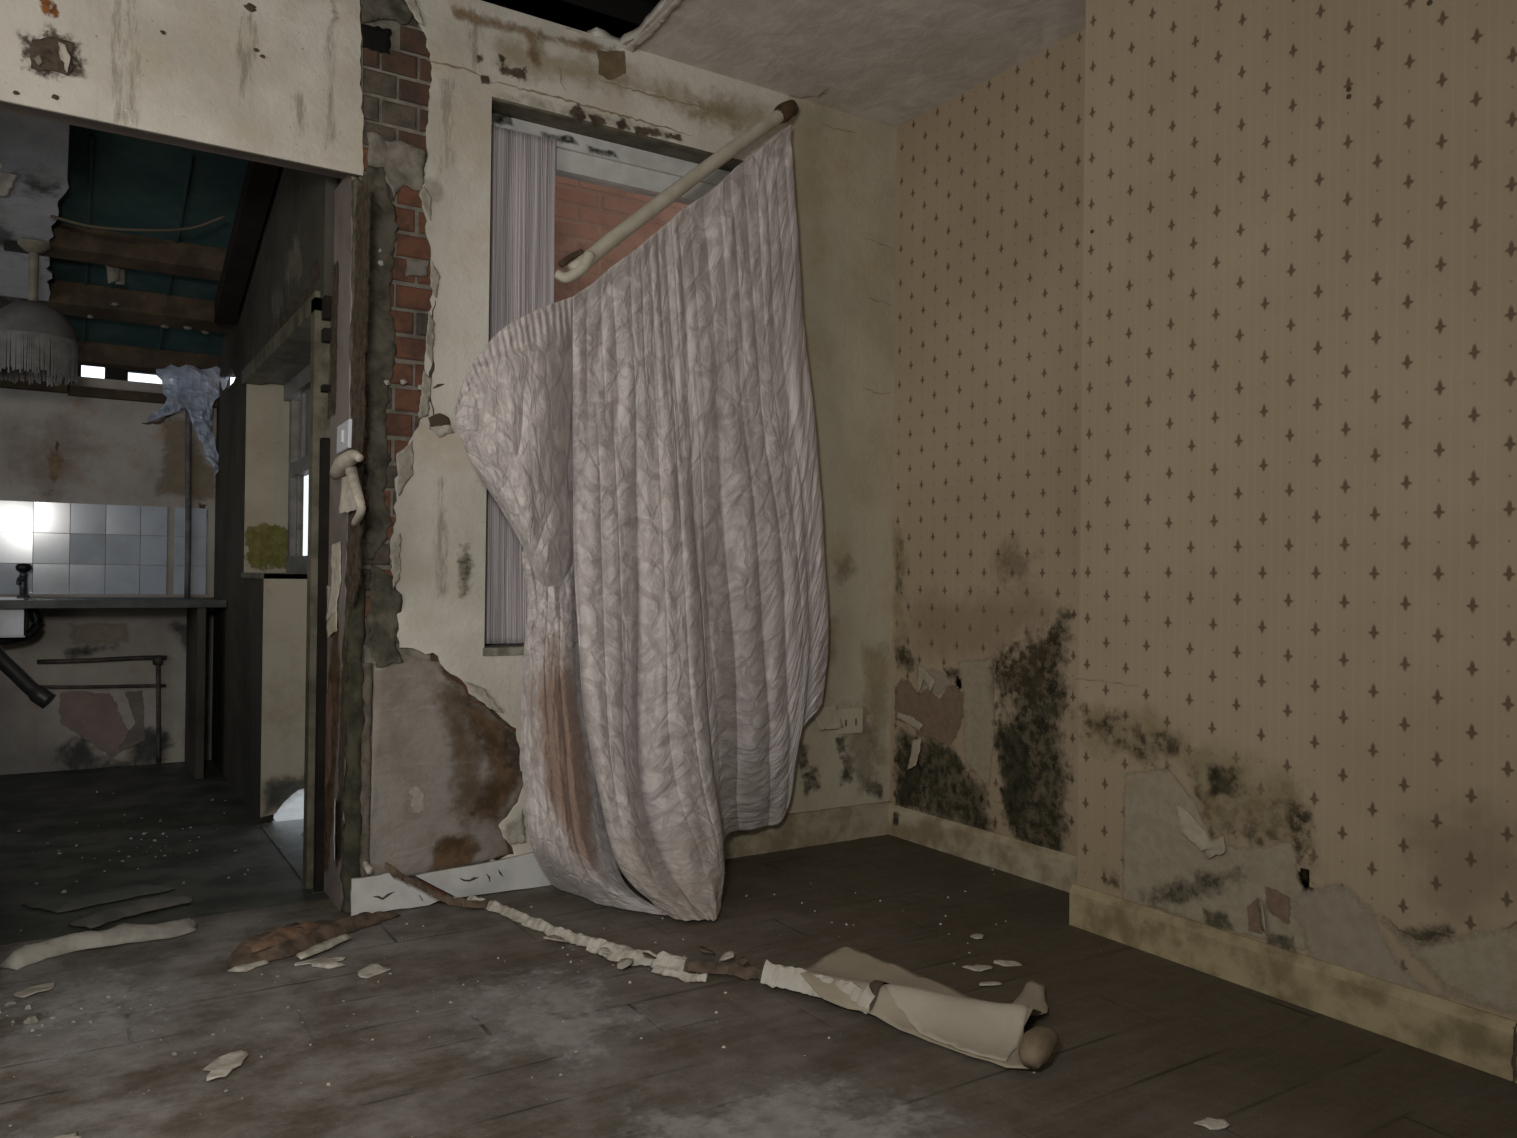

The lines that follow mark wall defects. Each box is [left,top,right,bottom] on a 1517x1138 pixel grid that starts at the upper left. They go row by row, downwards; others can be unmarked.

flaking render [22,28,83,77]
flaking render [326,0,527,914]
peeling [896,712,923,770]
damp [836,614,1071,851]
damp [1087,715,1310,850]
peeling [1123,769,1307,950]
damp [1205,911,1231,929]